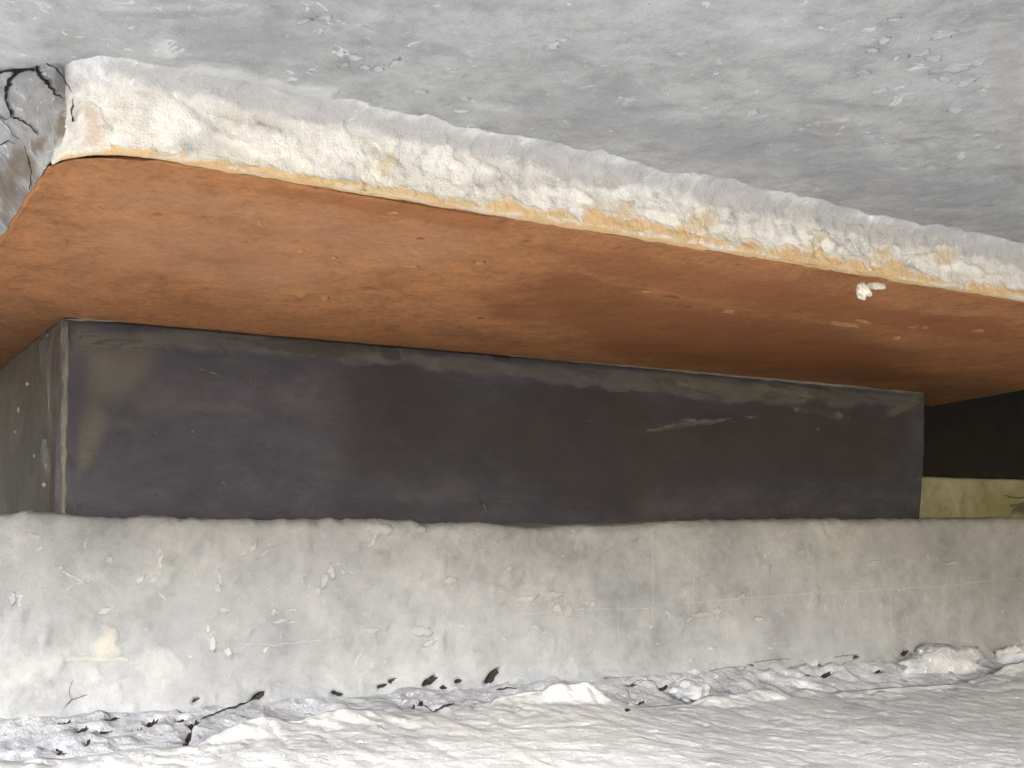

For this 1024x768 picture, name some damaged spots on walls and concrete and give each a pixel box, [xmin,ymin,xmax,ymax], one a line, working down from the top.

crack [0,63,74,190]
efflorescence [129,92,213,152]
efflorescence [223,118,378,169]
efflorescence [368,103,426,116]
efflorescence [409,144,503,185]
water stain [541,19,1024,243]
efflorescence [520,181,596,209]
water stain [16,159,523,299]
efflorescence [754,223,845,252]
efflorescence [896,253,986,279]
water stain [67,321,924,463]